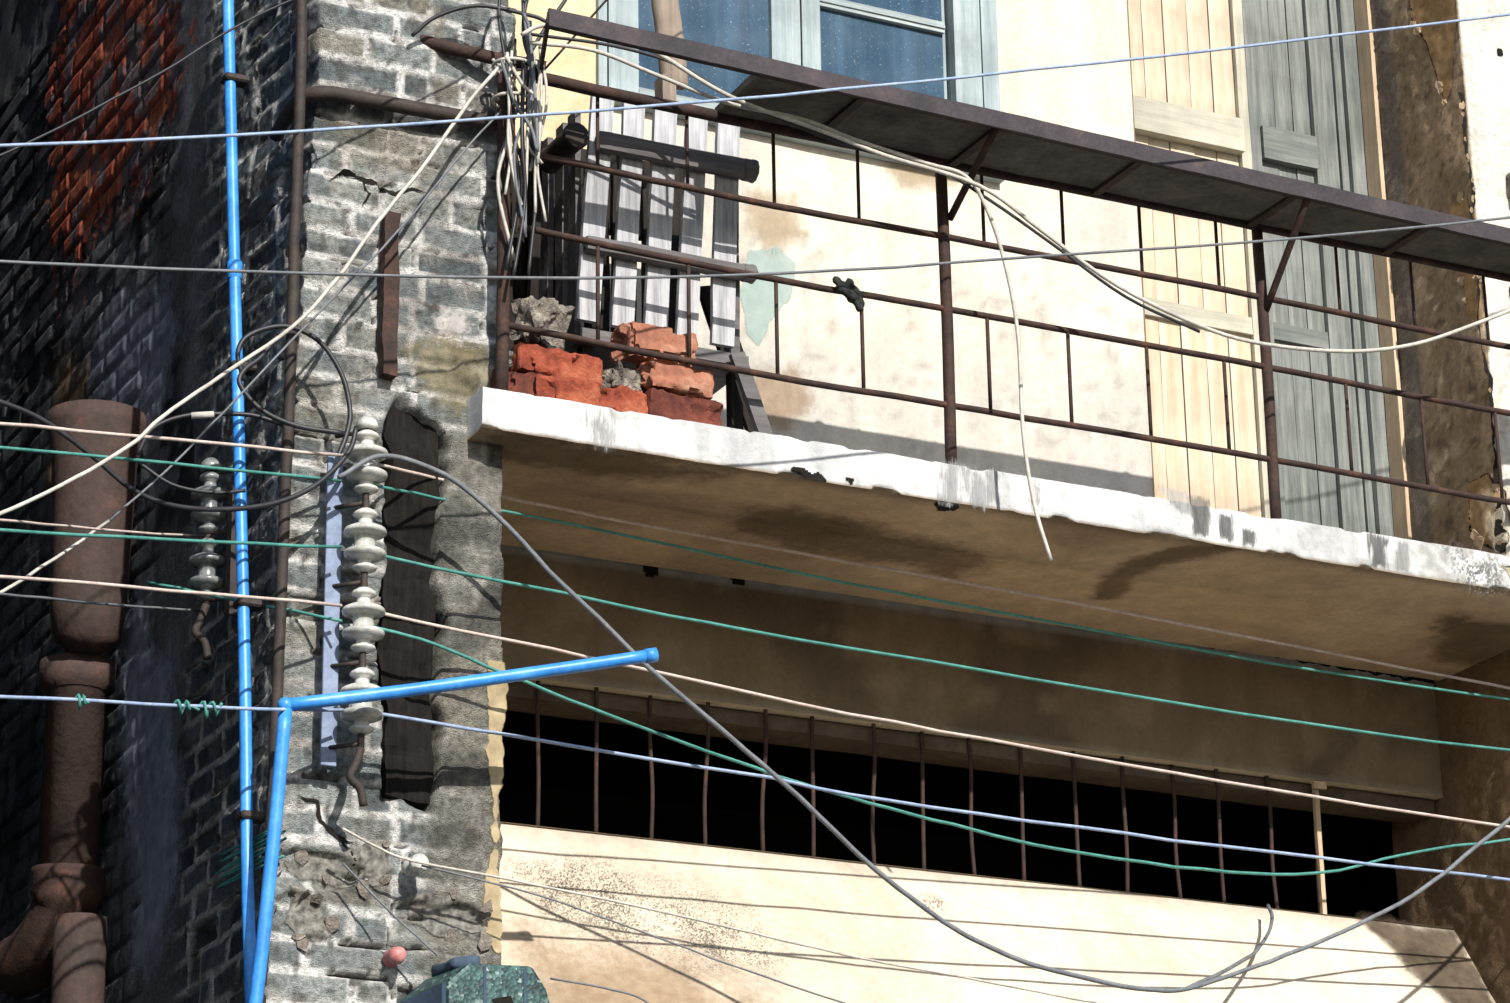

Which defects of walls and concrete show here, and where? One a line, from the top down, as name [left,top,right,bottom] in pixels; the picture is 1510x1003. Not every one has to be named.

flaking render [35,0,197,323]
crack [329,169,427,206]
peeling [740,247,796,345]
spalling [1457,272,1510,577]